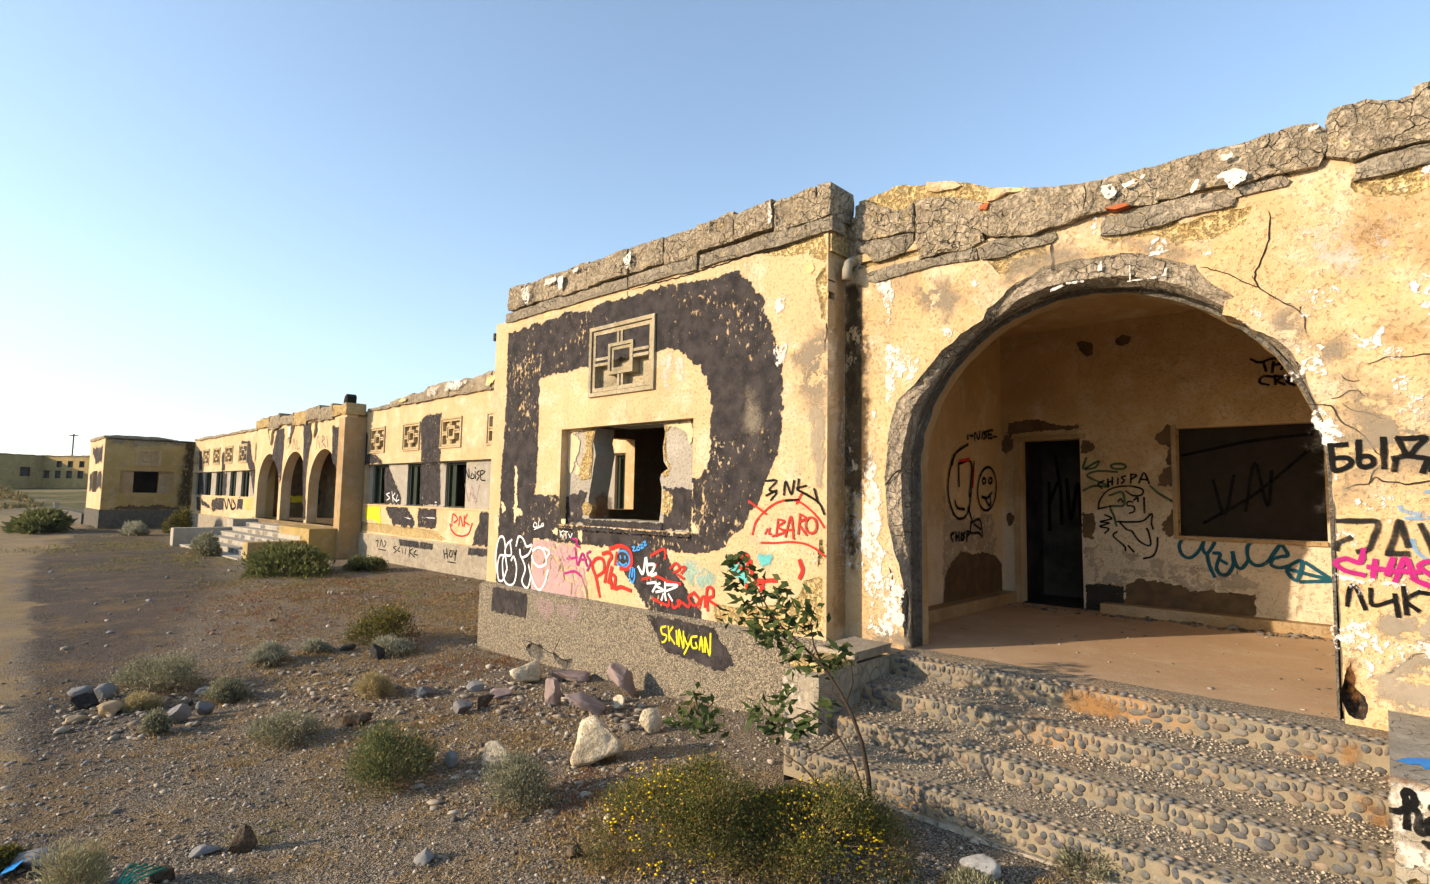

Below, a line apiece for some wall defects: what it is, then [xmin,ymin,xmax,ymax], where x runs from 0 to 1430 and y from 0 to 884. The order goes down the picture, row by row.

peeling [926,181,961,193]
peeling [987,187,1026,203]
peeling [1101,174,1145,199]
peeling [1217,152,1247,189]
crack [1202,211,1307,333]
peeling [1407,273,1430,315]
peeling [1352,326,1402,359]
spalling [713,206,1345,648]
crack [1303,353,1430,489]
spalling [943,496,1430,720]
peeling [1389,783,1430,884]